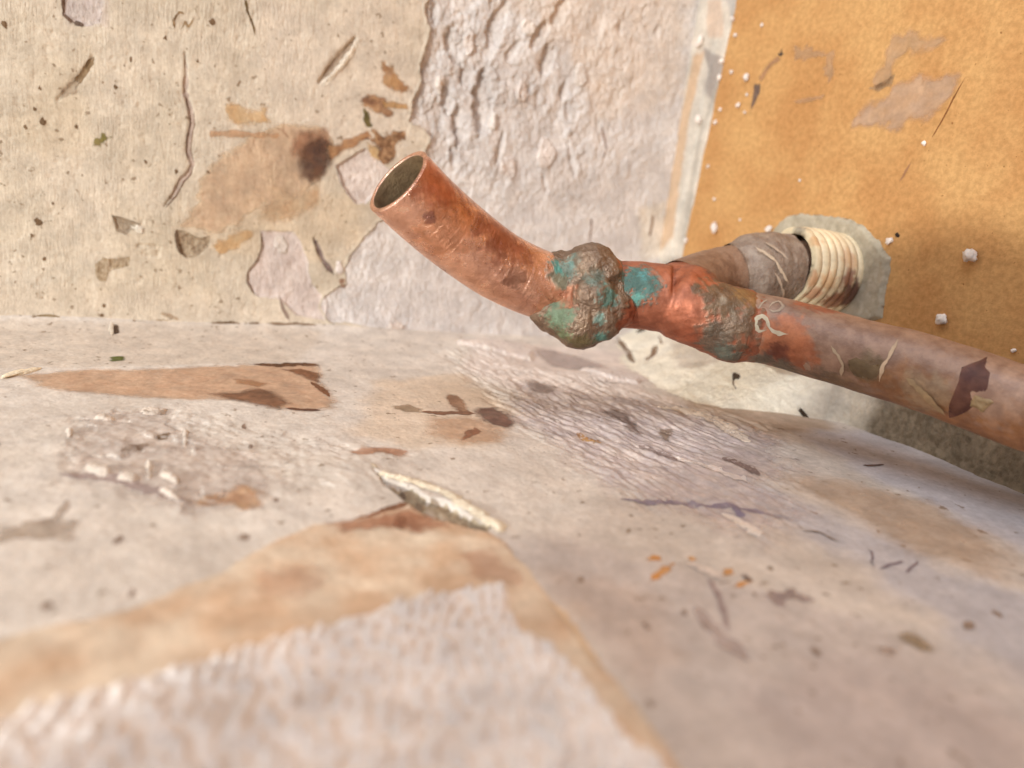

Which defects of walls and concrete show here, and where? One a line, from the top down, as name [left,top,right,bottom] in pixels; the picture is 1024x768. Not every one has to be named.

crack [165,52,195,208]
flaking render [409,0,699,263]
flaking render [246,220,553,337]
flaking render [354,463,509,533]